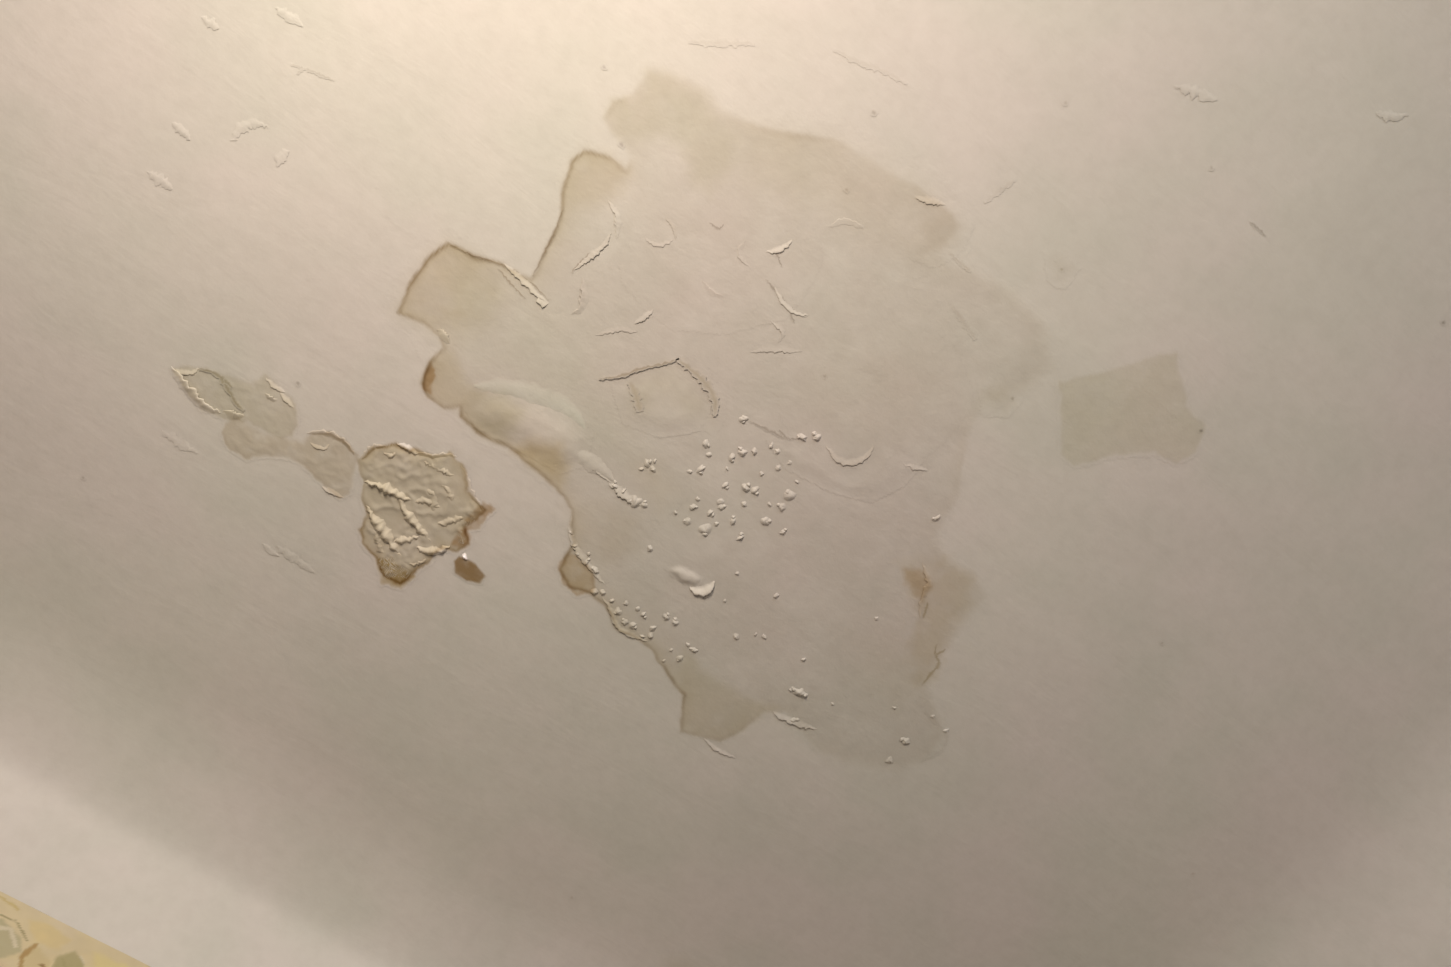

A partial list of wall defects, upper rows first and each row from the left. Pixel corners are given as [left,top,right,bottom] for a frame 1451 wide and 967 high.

water stain [380,58,1025,523]
peeling [169,362,484,583]
peeling [534,118,1062,777]
water stain [1054,348,1210,470]
water stain [668,642,786,745]
water stain [836,548,982,729]